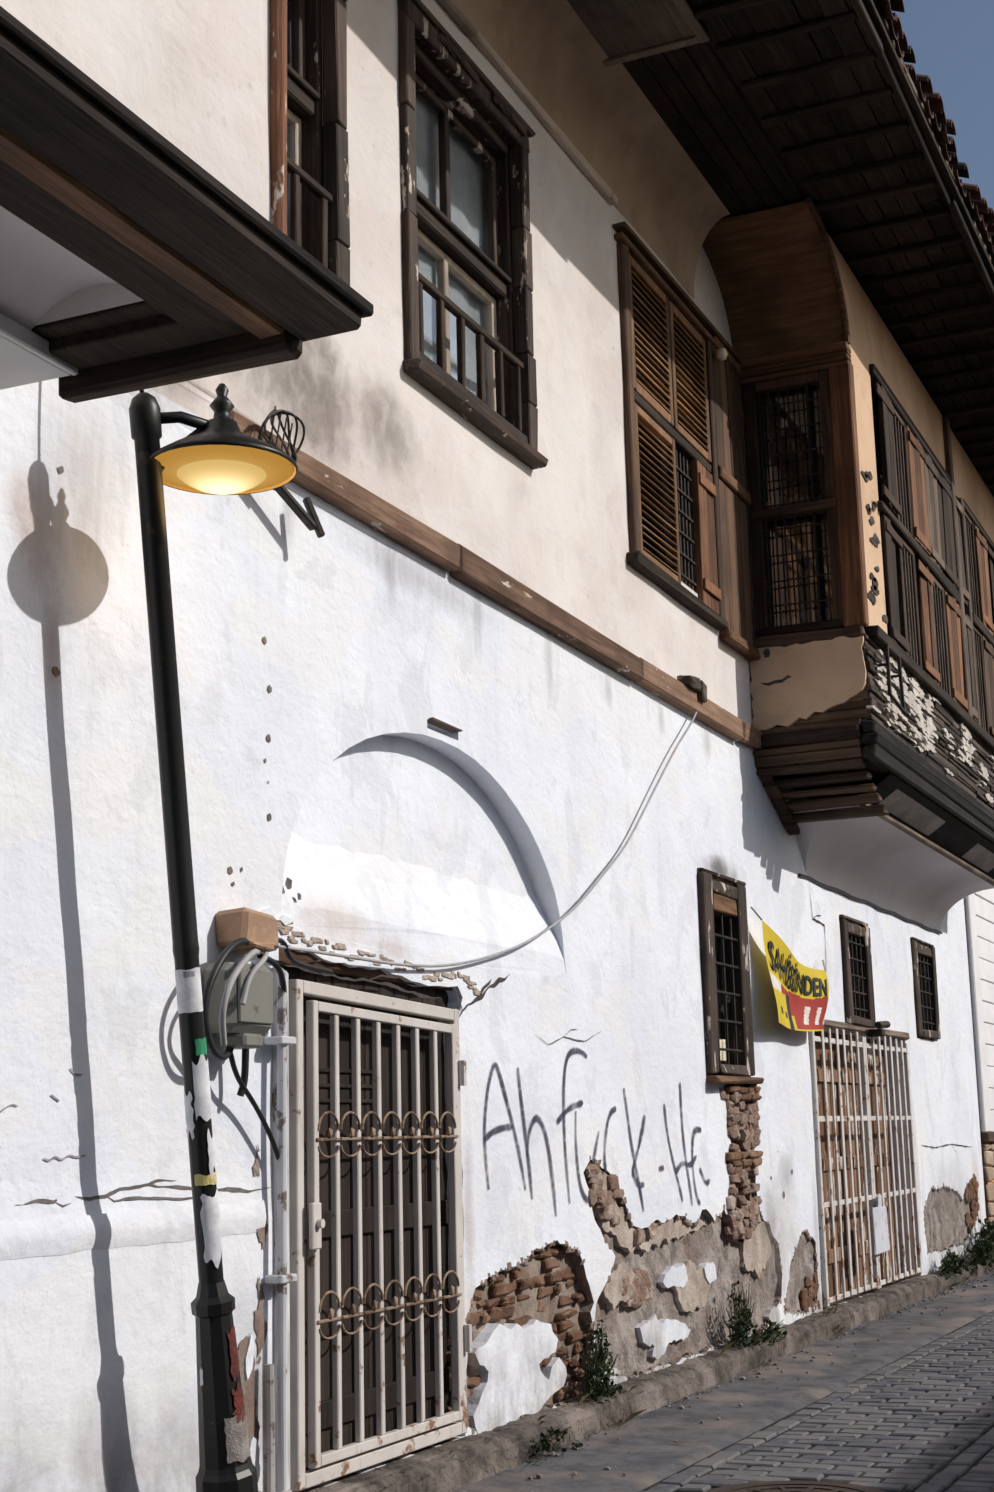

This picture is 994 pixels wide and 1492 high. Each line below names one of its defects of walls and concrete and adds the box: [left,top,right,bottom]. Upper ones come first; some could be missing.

flaking render [866,649,994,805]
flaking render [259,908,481,996]
crack [15,1179,269,1207]
peeling [256,1200,268,1249]
spalling [446,1084,821,1434]
spalling [923,1174,980,1255]
peeling [238,1277,268,1481]